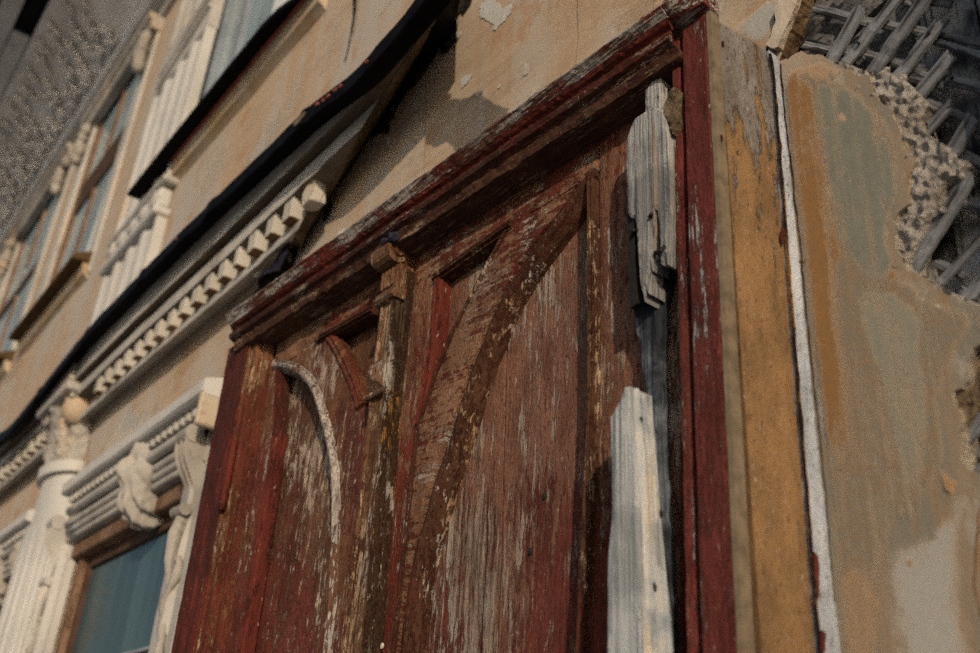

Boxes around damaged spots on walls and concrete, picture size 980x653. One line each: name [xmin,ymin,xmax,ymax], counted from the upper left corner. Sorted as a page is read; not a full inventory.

crack [344,0,356,62]
flaking render [479,0,512,30]
flaking render [797,0,980,306]
flaking render [955,357,980,474]